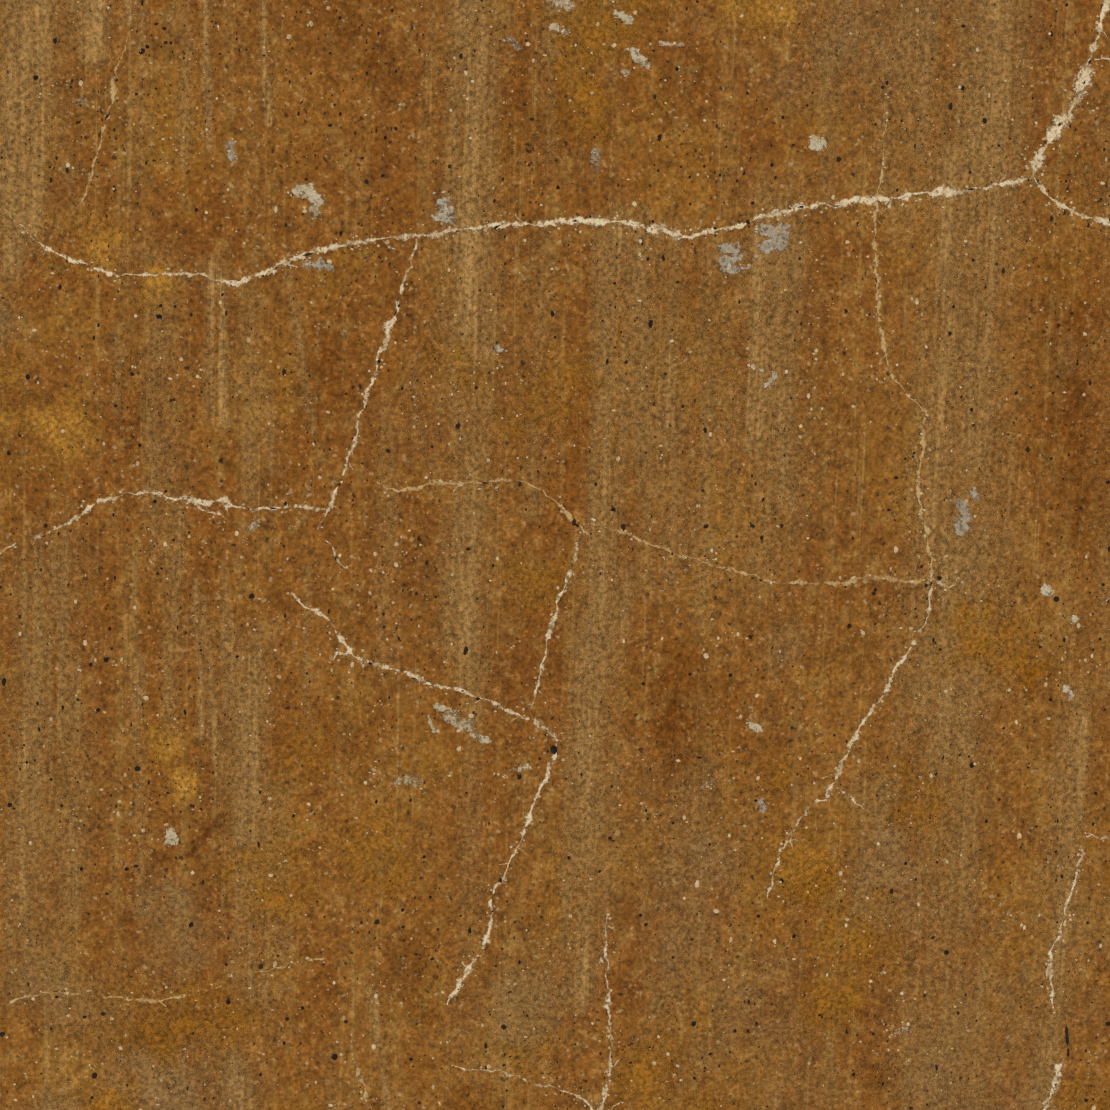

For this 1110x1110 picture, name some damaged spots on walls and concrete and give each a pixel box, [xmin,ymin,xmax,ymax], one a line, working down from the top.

rust [547,10,611,135]
rust [724,0,796,26]
rust [87,229,124,267]
rust [143,264,173,298]
crack [0,0,1110,632]
rust [147,730,198,801]
crack [286,570,572,1005]
crack [767,640,917,899]
rust [777,843,835,900]
crack [6,984,222,1007]
crack [451,913,623,1110]
crack [1040,832,1110,1110]